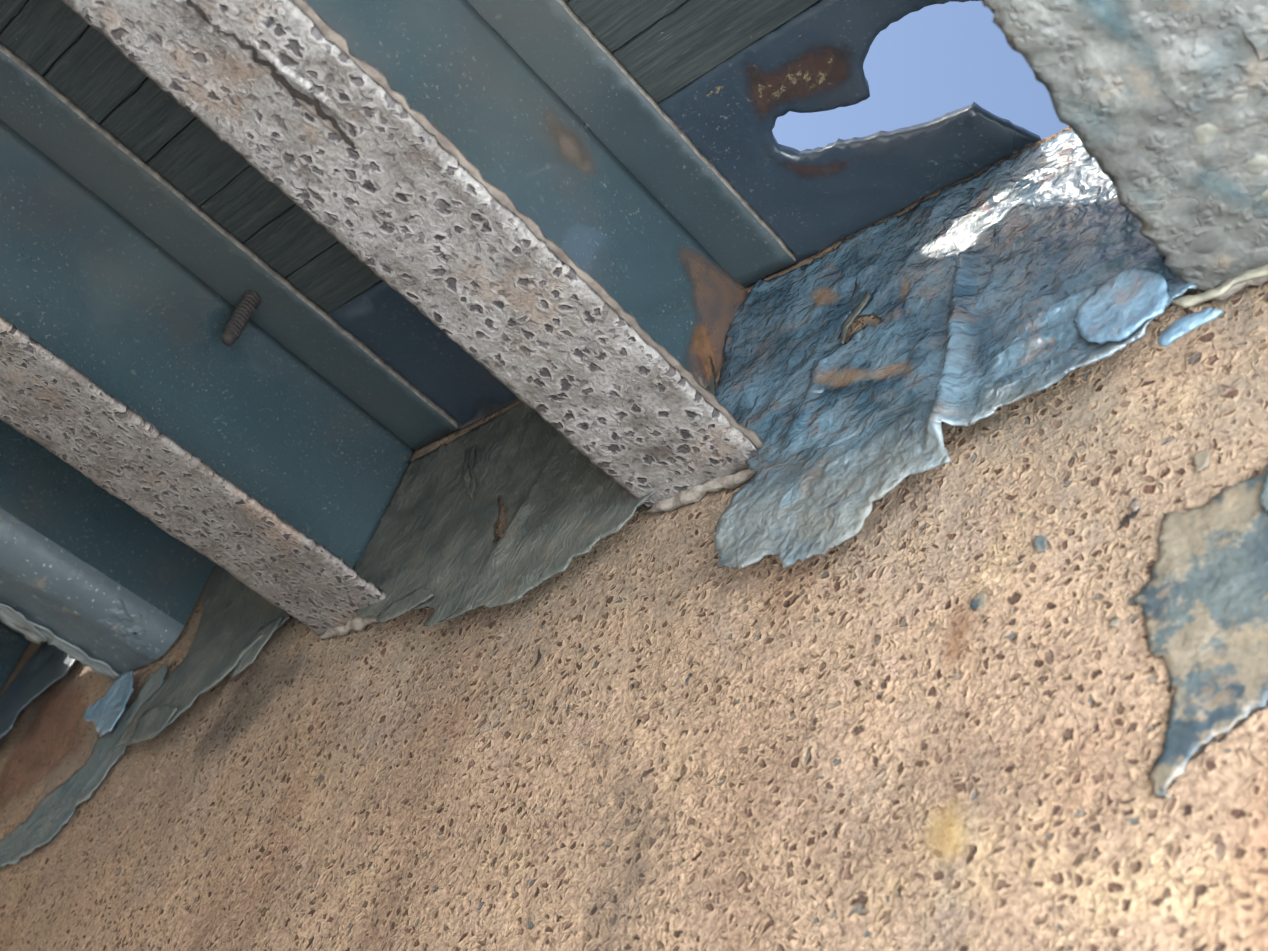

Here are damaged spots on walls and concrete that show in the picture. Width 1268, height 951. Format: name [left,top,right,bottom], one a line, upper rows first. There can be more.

crack [187,0,357,150]
corrosion [292,0,764,448]
corrosion [706,48,848,112]
peeling [706,130,1268,571]
peeling [0,564,290,868]
peeling [353,402,656,627]
peeling [1132,463,1268,798]